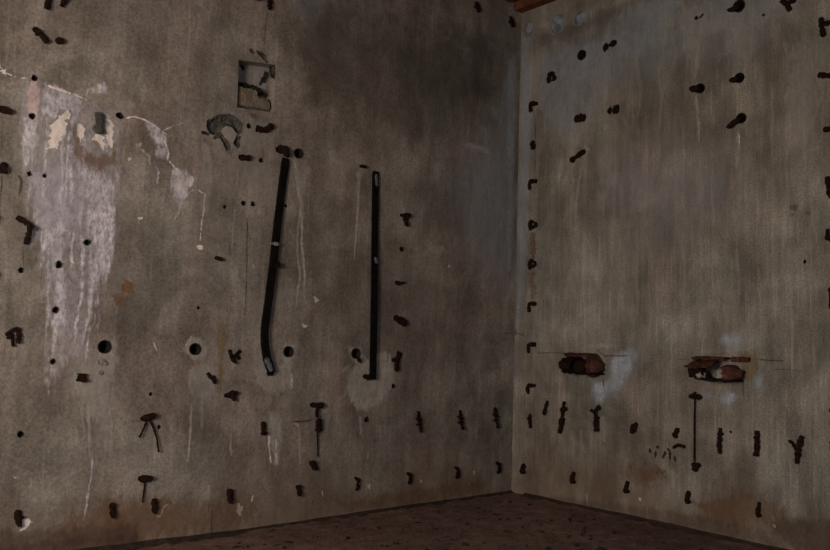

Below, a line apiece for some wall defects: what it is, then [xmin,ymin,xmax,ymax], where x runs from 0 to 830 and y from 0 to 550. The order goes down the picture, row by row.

leakage [22,81,119,360]
crack [127,116,195,219]